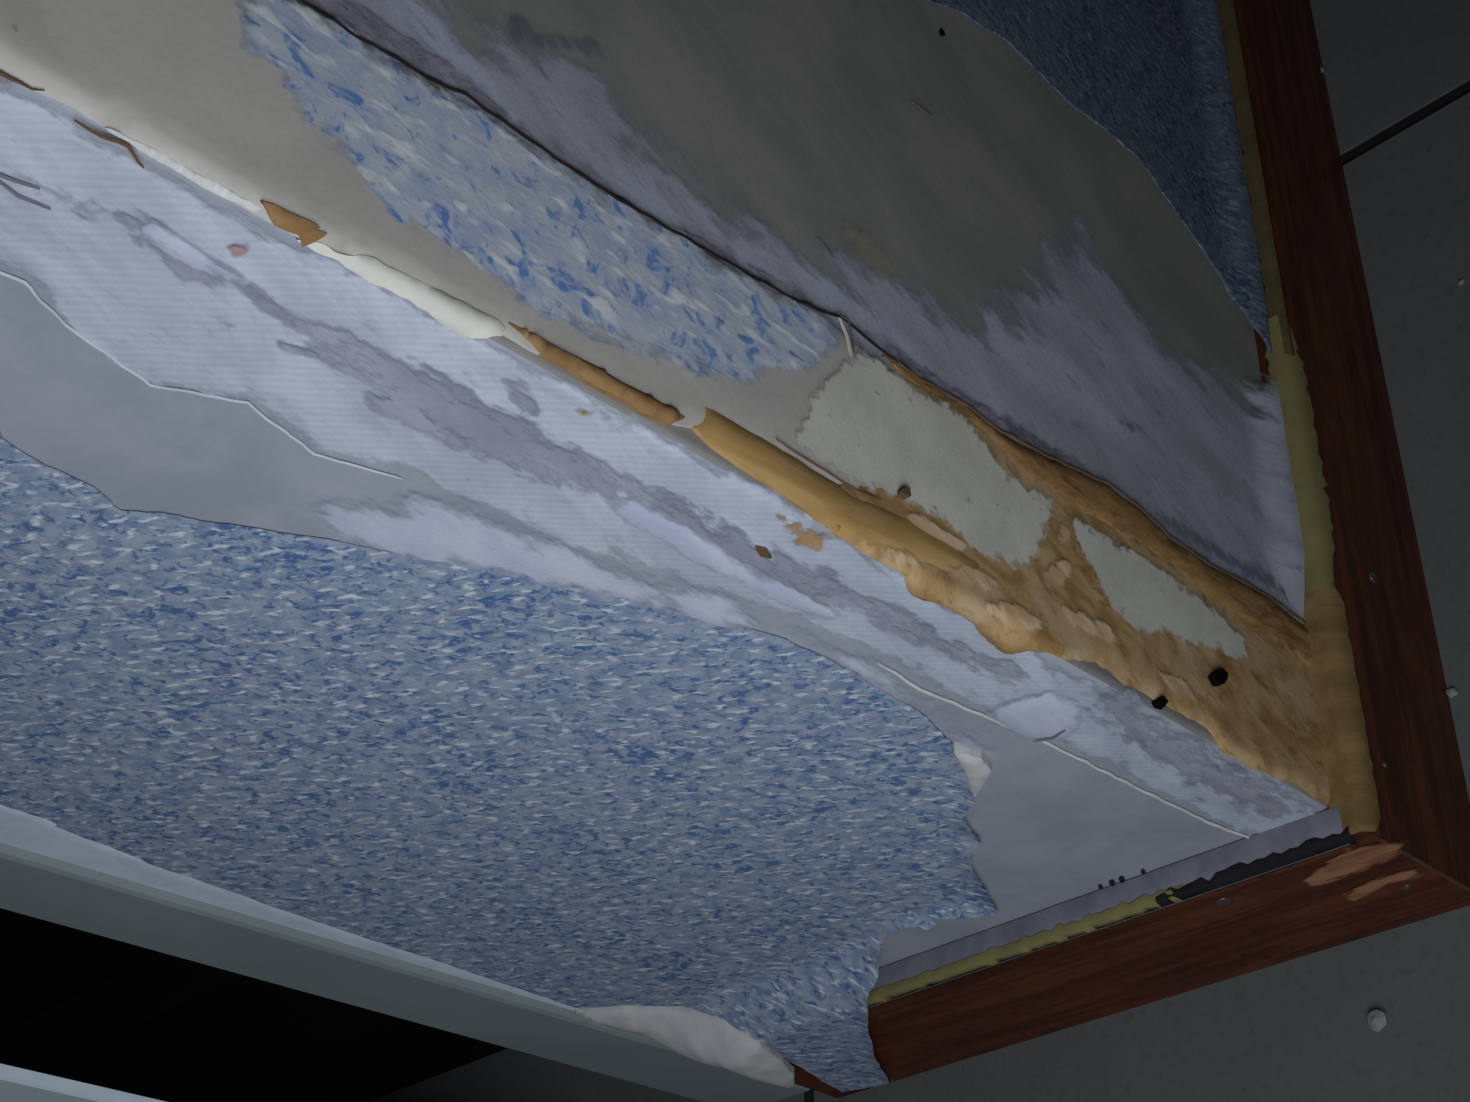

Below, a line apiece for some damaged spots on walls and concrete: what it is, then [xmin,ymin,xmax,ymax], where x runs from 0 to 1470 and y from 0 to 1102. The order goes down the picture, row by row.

spalling [0,70,45,91]
damp [114,213,1027,680]
crack [298,0,908,367]
spalling [74,119,1381,835]
damp [1217,0,1335,595]
peeling [0,805,578,1011]
damp [1086,674,1303,819]